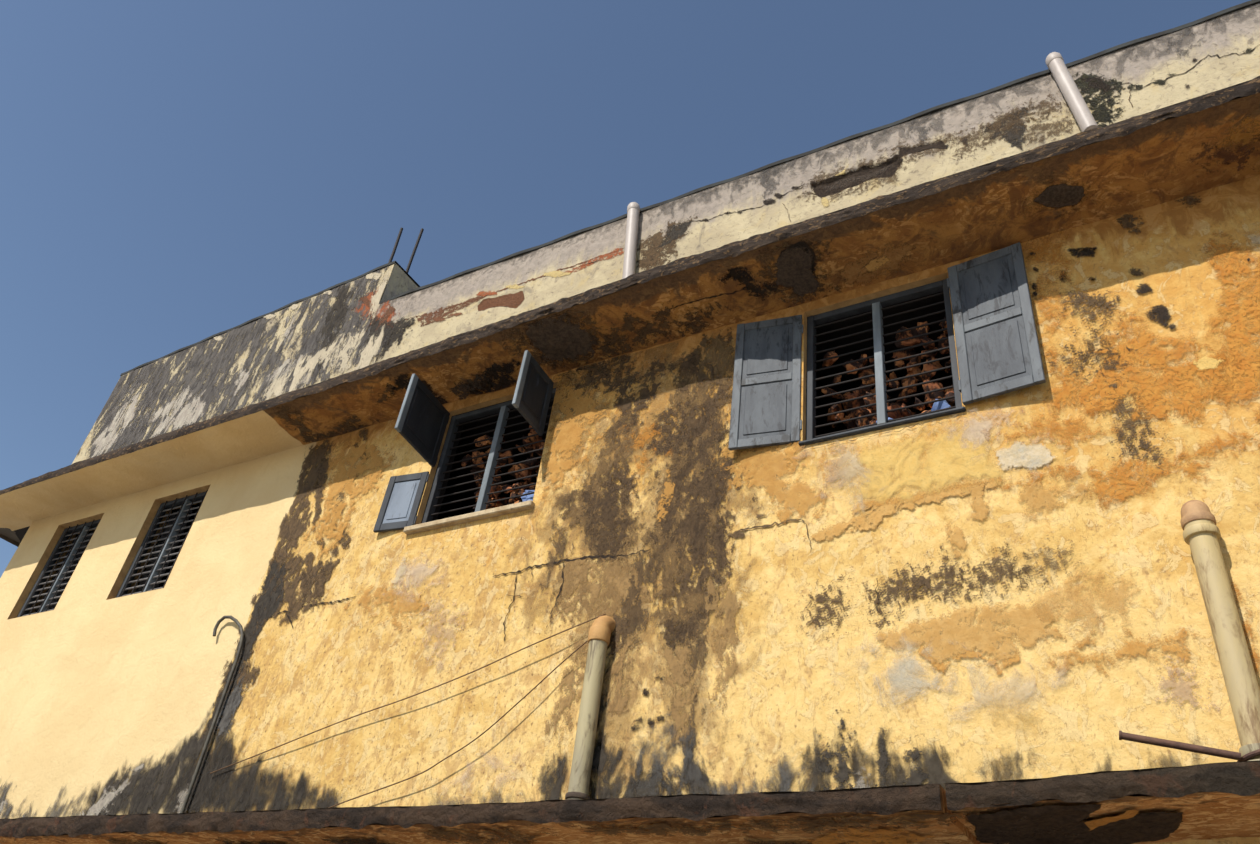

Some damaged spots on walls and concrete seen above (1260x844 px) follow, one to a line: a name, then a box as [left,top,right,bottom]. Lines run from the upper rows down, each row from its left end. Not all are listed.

crack [1123,44,1260,107]
water stain [1091,103,1114,127]
spalling [797,136,968,207]
spalling [1033,183,1085,208]
water stain [76,266,415,458]
crack [727,514,811,551]
water stain [538,231,1260,801]
water stain [0,415,395,819]
water stain [344,557,436,631]
crack [492,549,651,641]
peeling [321,835,394,844]
spalling [575,804,1183,844]